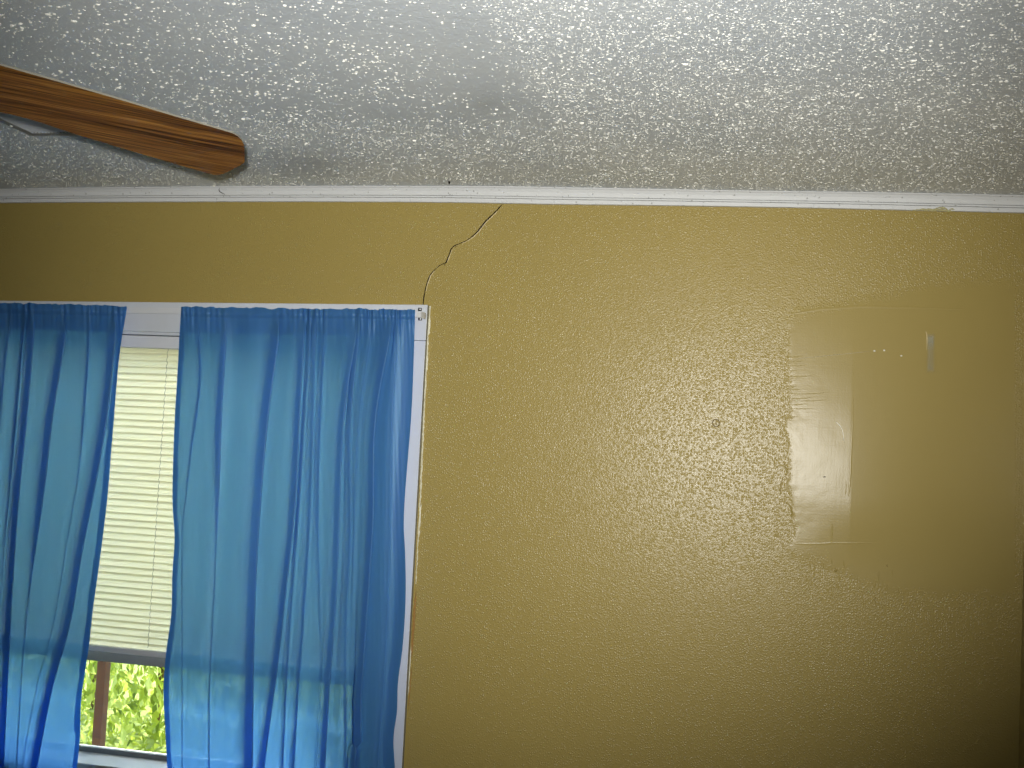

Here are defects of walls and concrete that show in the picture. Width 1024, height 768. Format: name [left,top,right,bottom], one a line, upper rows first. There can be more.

crack [415,205,502,582]